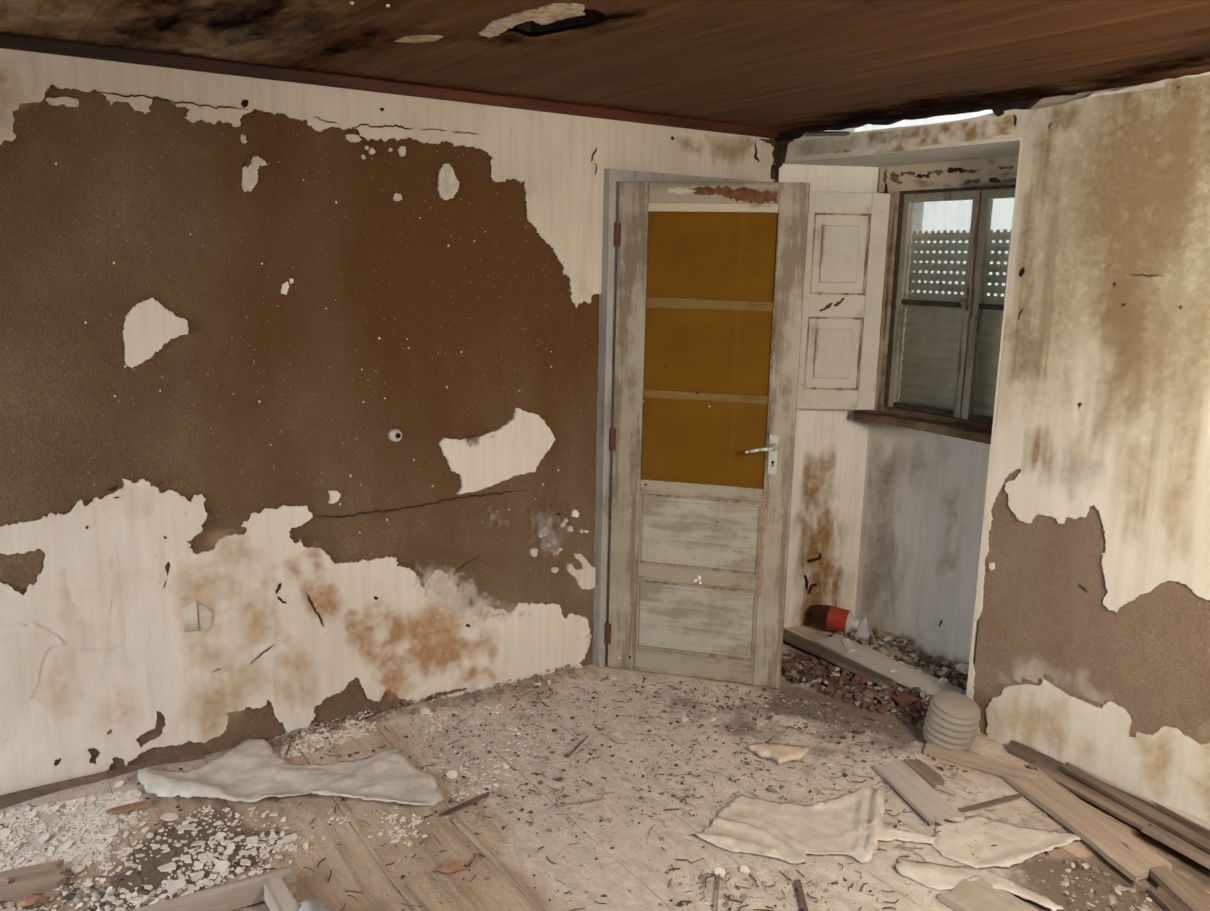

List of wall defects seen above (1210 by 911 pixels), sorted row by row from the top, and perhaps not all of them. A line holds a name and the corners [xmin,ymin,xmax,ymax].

damp [393,35,443,43]
peeling [883,165,1017,194]
flaking render [0,85,599,666]
flaking render [973,469,1210,744]